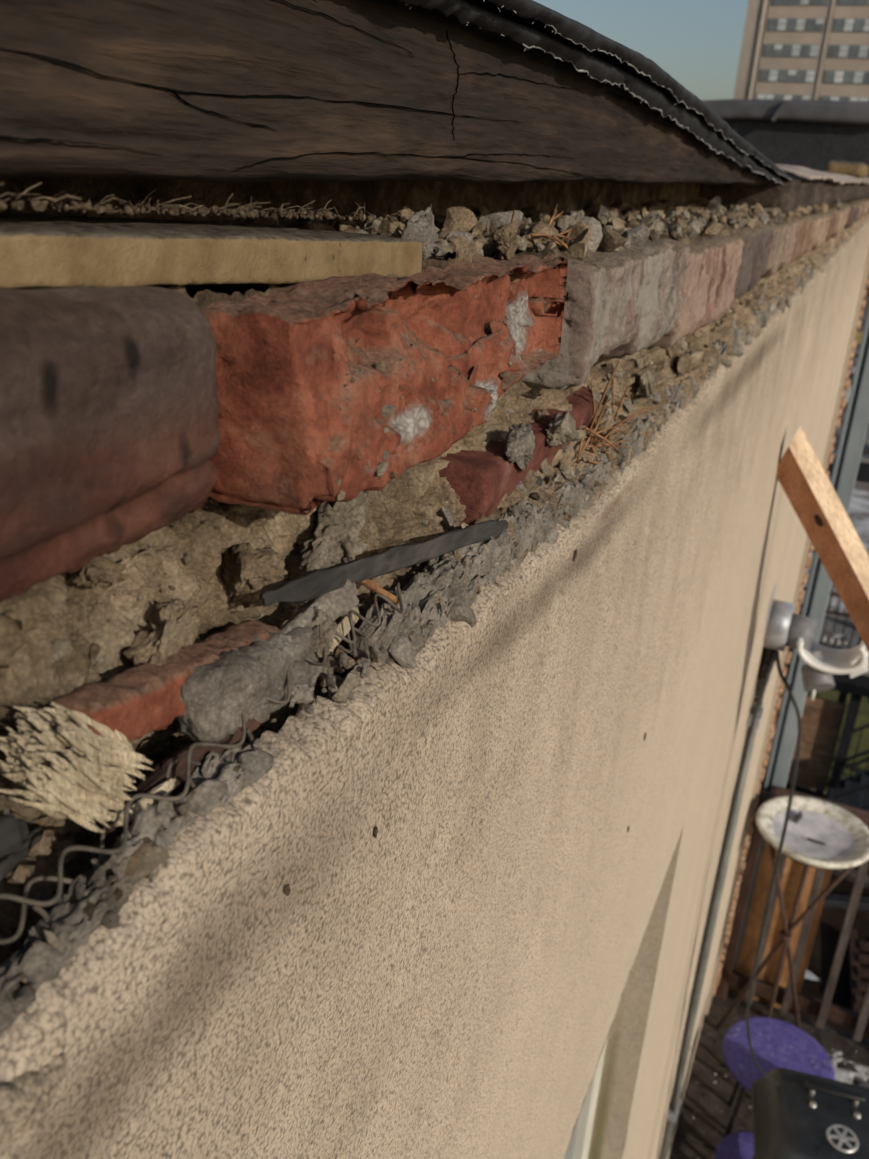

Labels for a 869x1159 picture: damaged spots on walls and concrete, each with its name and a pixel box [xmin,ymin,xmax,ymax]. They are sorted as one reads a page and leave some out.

crack [279,0,415,55]
crack [0,30,619,184]
spalling [719,283,806,368]
spalling [450,598,477,628]
spalling [331,673,359,704]
spalling [236,750,274,789]
spalling [185,779,228,817]